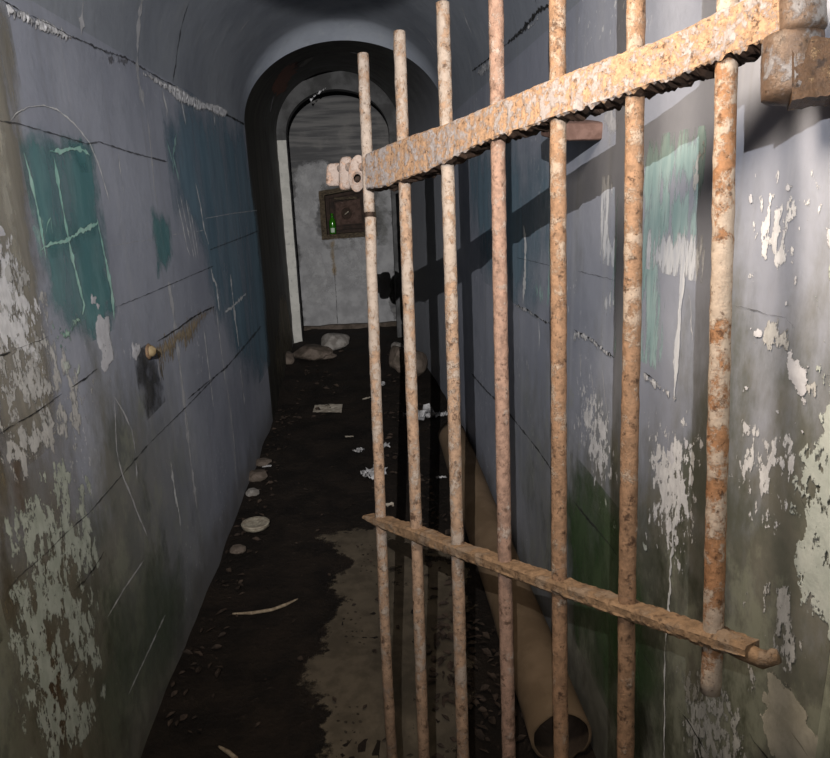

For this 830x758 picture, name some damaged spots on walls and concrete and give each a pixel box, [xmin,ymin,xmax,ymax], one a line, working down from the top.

crack [504,4,549,46]
crack [1,121,167,162]
leakage [0,0,267,471]
peeling [749,171,822,270]
peeling [91,294,115,381]
leakage [279,295,292,354]
peeling [750,319,830,405]
peeling [574,387,617,486]
peeling [0,225,106,758]
peeling [643,422,703,573]
leakage [32,486,93,758]
peeling [676,404,830,758]